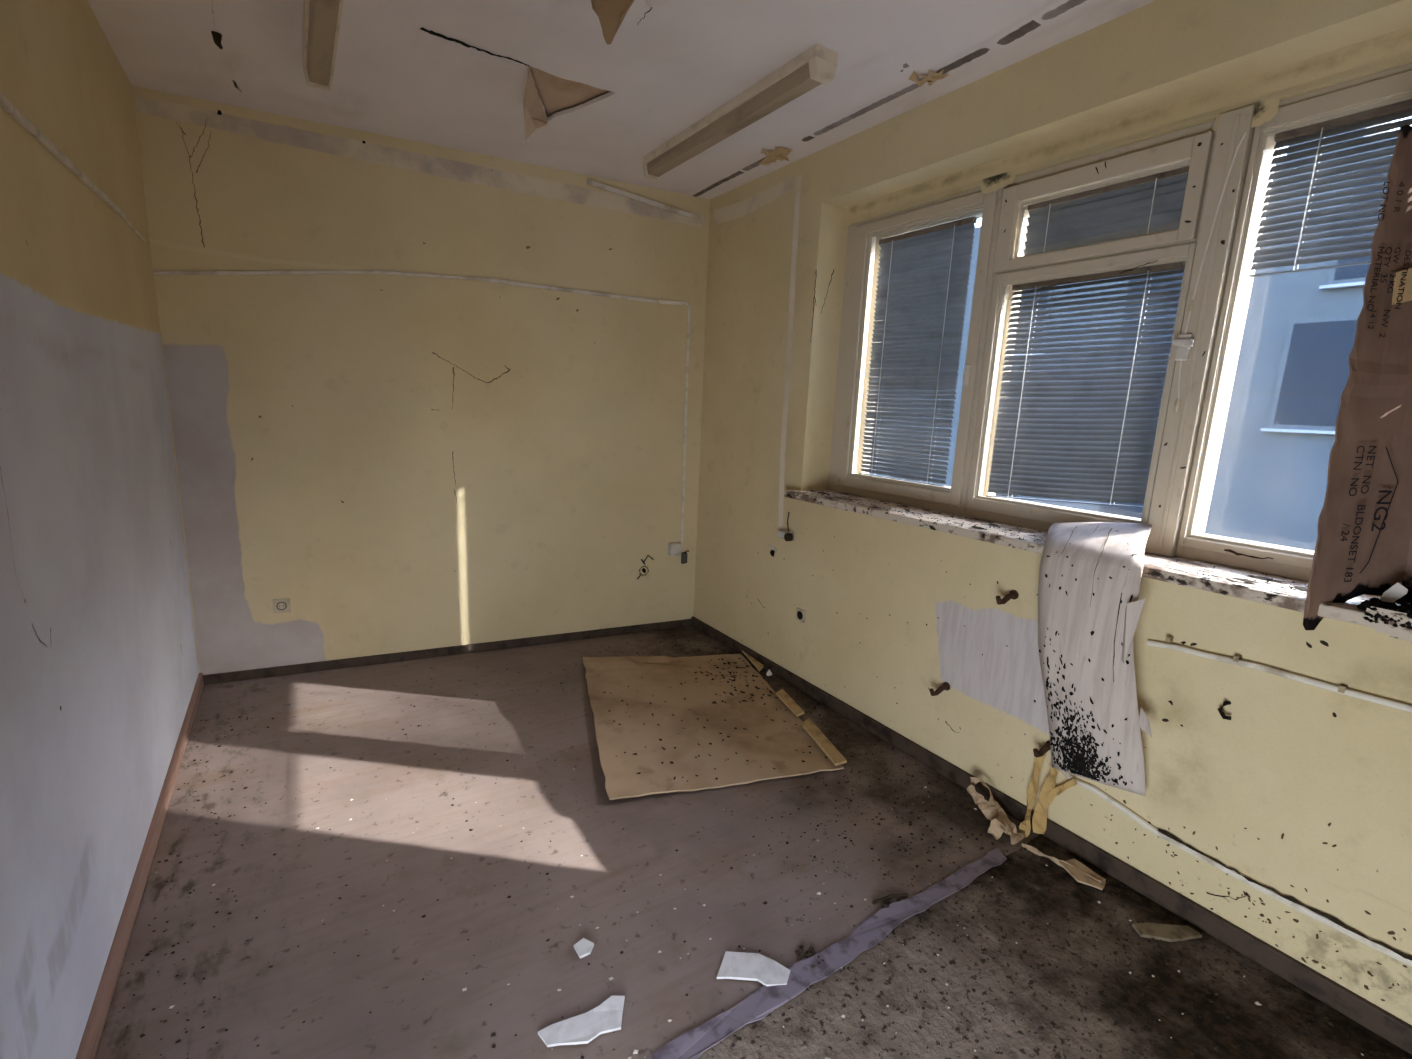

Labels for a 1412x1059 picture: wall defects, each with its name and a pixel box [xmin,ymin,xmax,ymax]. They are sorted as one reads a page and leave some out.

crack [420,27,529,72]
crack [176,119,211,247]
crack [431,352,510,411]
damp [1039,617,1412,1025]